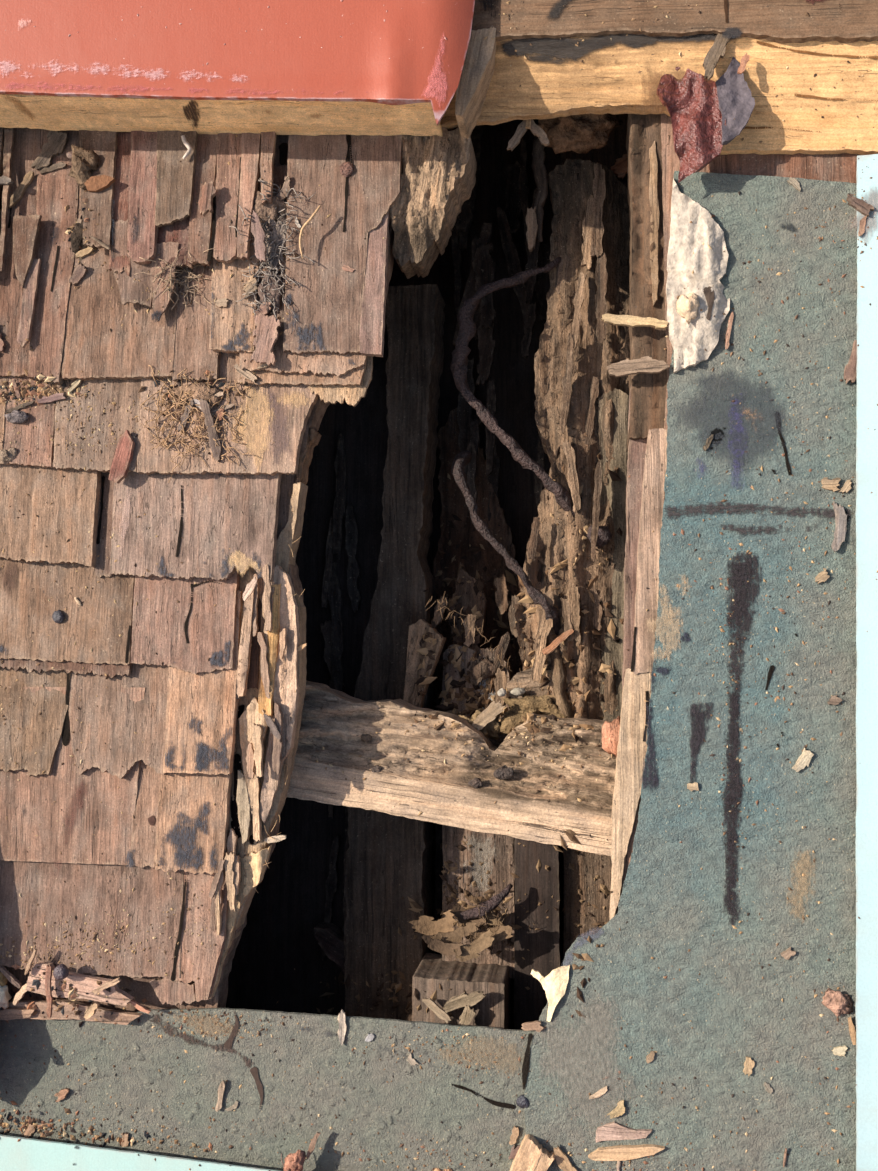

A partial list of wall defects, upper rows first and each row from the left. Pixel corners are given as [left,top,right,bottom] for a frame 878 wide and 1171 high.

peeling [611,154,628,180]
crack [175,485,183,557]
crack [184,581,220,643]
crack [62,673,70,746]
peeling [472,667,552,731]
water stain [159,802,217,871]
water stain [724,693,749,912]
peeling [531,965,570,1022]
crack [152,1011,263,1109]
crack [452,1033,533,1109]